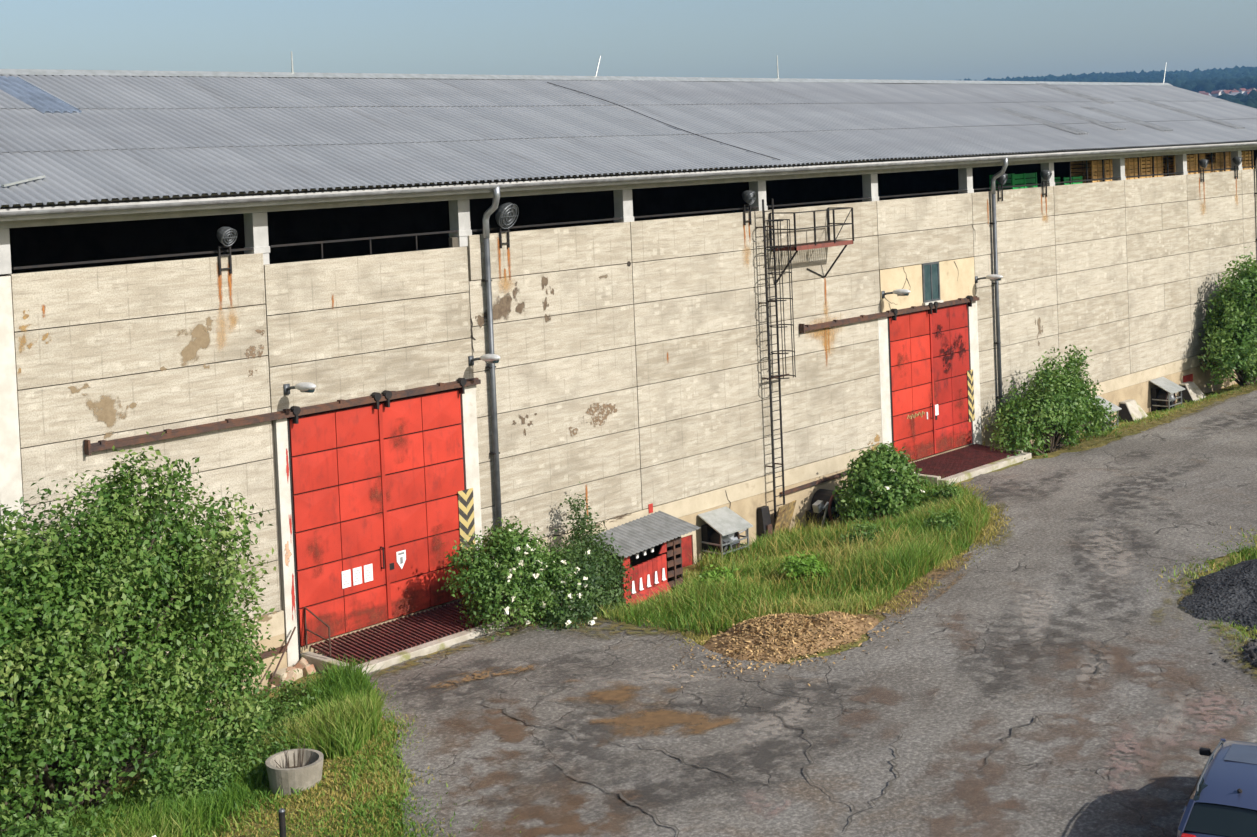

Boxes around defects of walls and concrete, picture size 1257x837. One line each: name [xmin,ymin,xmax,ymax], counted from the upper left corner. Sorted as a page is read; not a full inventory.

rust [498,239,510,280]
rust [217,265,232,304]
peeling [178,317,213,369]
peeling [68,383,137,439]
spalling [569,402,617,436]